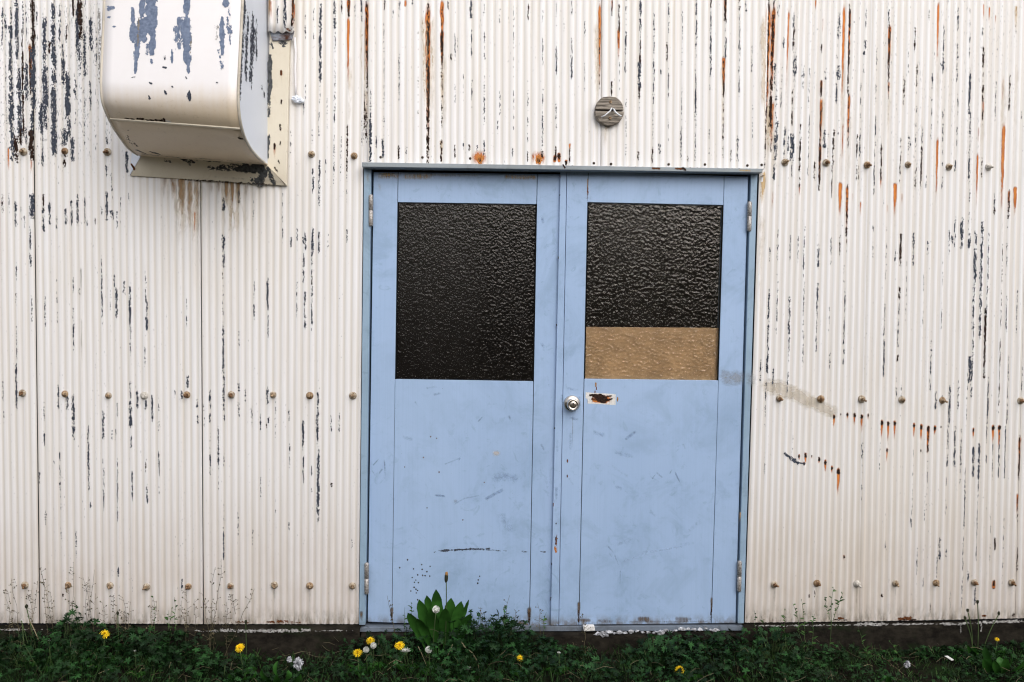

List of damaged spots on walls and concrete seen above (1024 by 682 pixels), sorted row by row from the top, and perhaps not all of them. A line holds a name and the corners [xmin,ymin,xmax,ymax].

peeling [1,0,116,167]
peeling [129,0,192,101]
rust [419,1,444,177]
rust [506,144,571,179]
rust [743,0,790,194]
rust [842,8,851,147]
rust [1001,126,1017,219]
peeling [899,8,1022,608]
peeling [57,383,160,522]
peeling [196,326,225,490]
peeling [289,392,340,521]
rust [913,423,942,452]